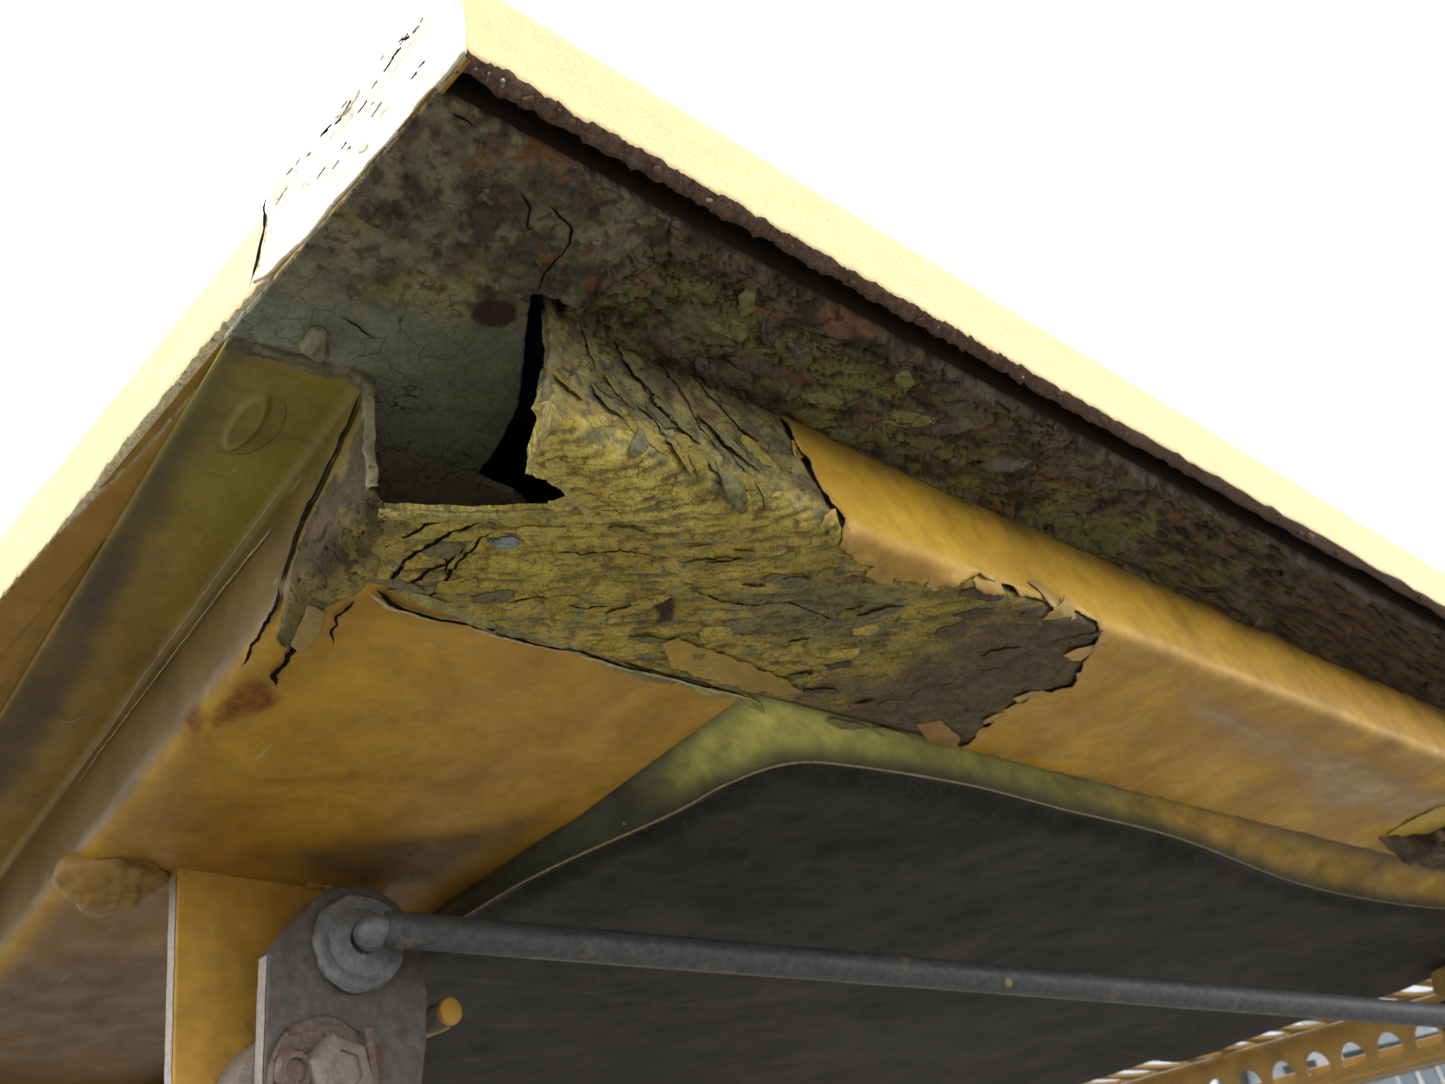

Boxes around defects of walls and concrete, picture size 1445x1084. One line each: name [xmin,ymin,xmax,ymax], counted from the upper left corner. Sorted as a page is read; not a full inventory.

crack [448,111,480,129]
crack [249,191,269,287]
crack [519,191,573,292]
crack [342,316,376,341]
crack [242,392,361,687]
peeling [972,573,1004,596]
peeling [1027,580,1076,625]
peeling [371,589,804,700]
peeling [1063,644,1105,661]
peeling [916,720,961,749]
leakage [1296,752,1441,817]
peeling [1386,805,1445,836]